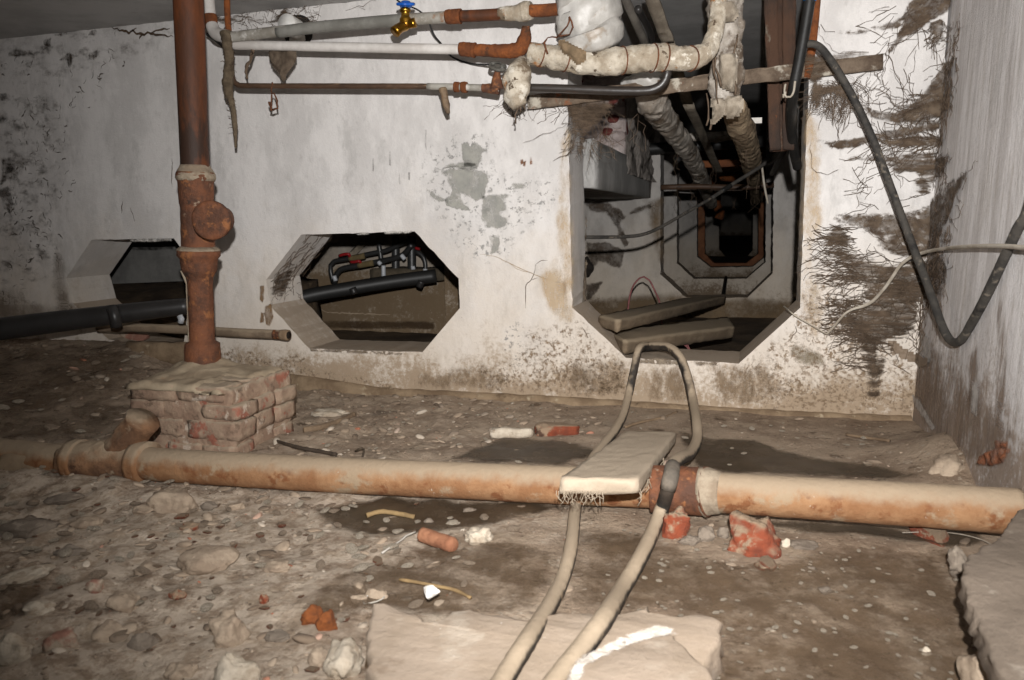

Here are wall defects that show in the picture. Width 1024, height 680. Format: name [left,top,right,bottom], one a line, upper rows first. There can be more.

crack [112,27,173,39]
peeling [430,135,552,256]
leakage [793,347,823,365]
leakage [570,363,623,394]
leakage [652,367,685,400]
leakage [713,367,774,403]
leakage [914,307,1010,455]